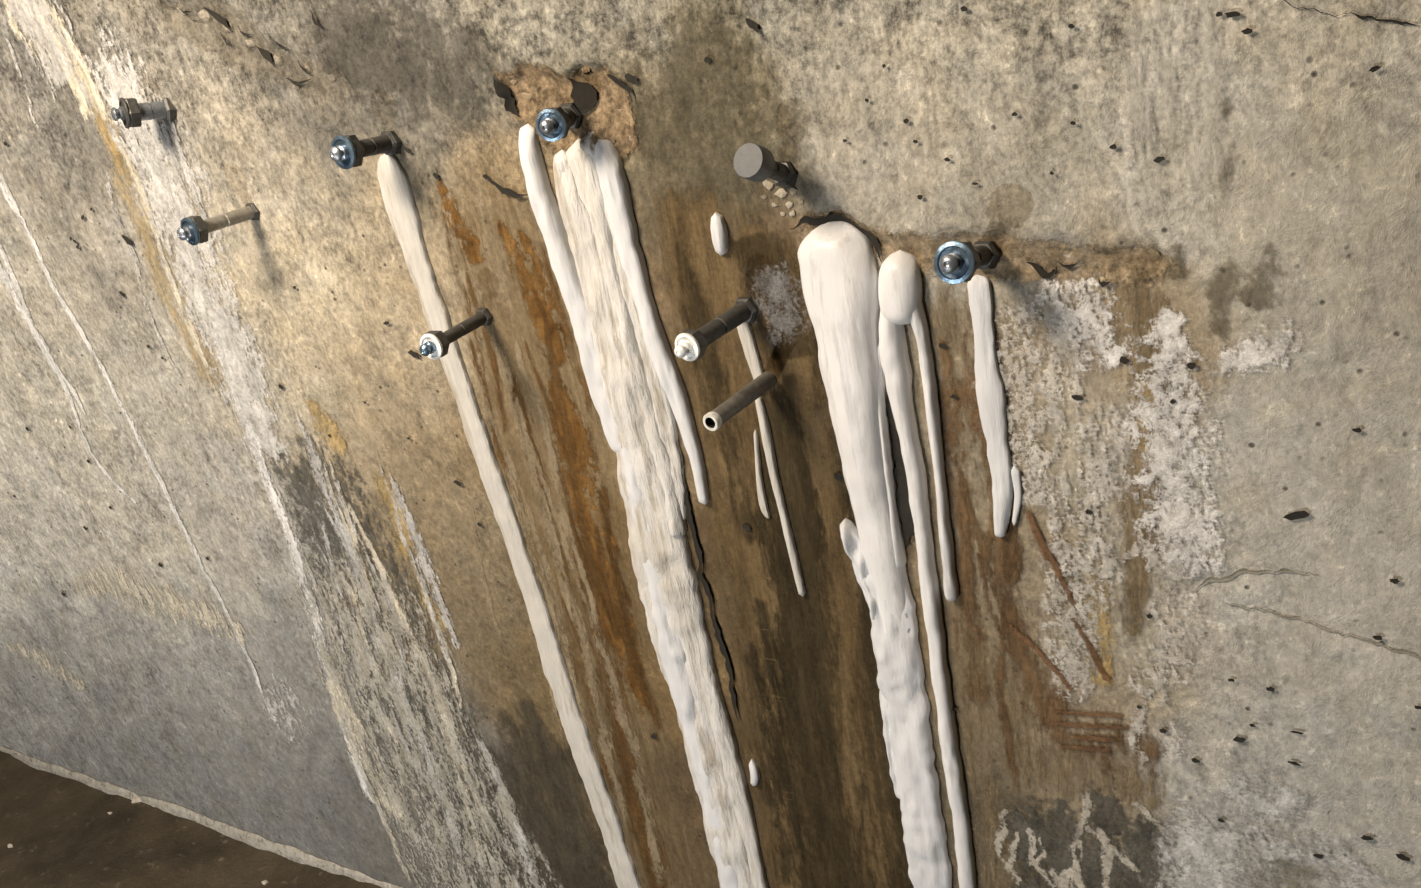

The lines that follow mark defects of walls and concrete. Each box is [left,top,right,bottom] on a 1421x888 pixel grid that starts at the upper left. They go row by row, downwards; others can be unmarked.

crack [160,0,206,23]
crack [1284,0,1419,26]
water stain [1118,45,1159,167]
water stain [0,0,642,888]
corrosion [437,177,701,888]
corrosion [921,270,1178,888]
water stain [967,245,1302,763]
crack [1195,569,1421,659]
water stain [994,770,1388,888]